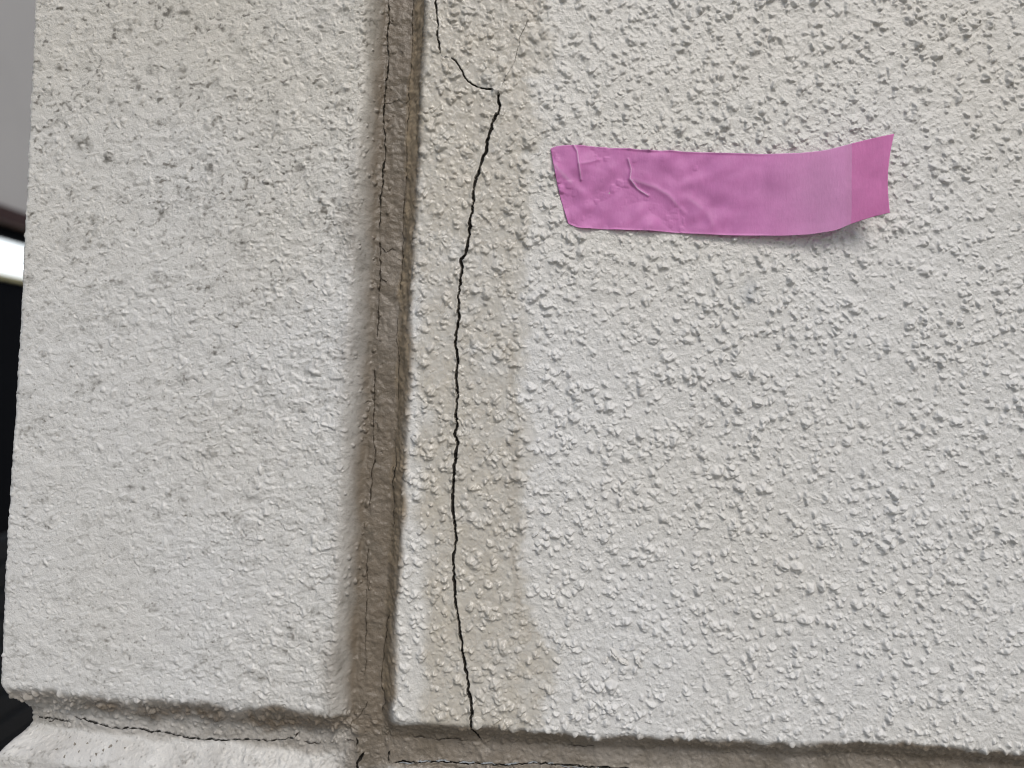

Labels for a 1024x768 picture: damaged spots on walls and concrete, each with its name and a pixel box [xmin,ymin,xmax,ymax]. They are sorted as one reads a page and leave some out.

crack [39,0,626,768]